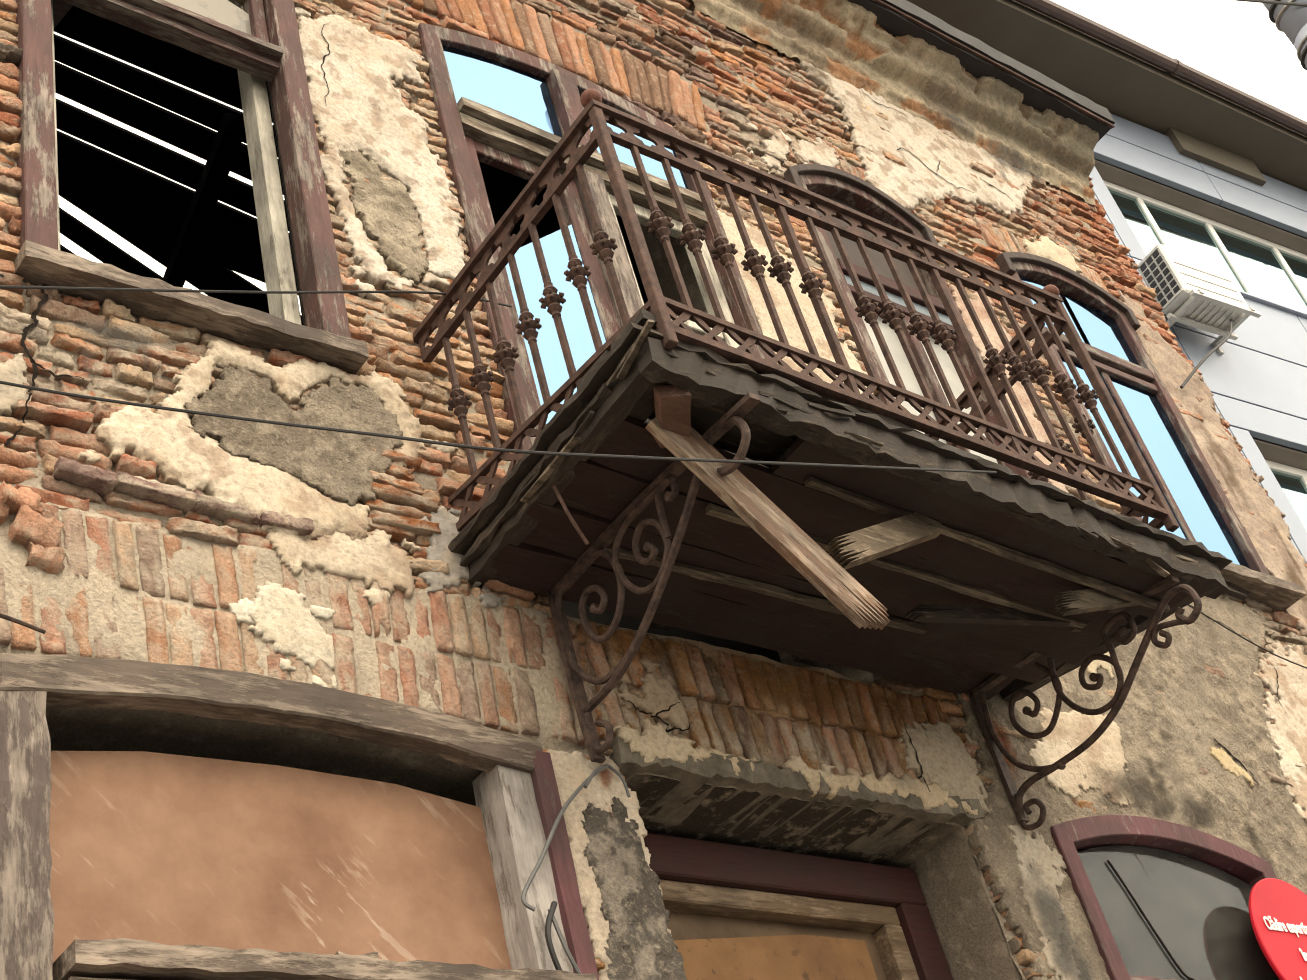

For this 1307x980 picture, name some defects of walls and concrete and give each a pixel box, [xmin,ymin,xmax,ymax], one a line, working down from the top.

peeling [746,123,840,173]
peeling [796,57,1034,218]
peeling [1022,235,1082,273]
crack [3,284,84,446]
peeling [78,339,506,689]
crack [621,698,692,732]
peeling [613,655,757,776]
peeling [782,720,993,815]
peeling [1253,641,1307,838]